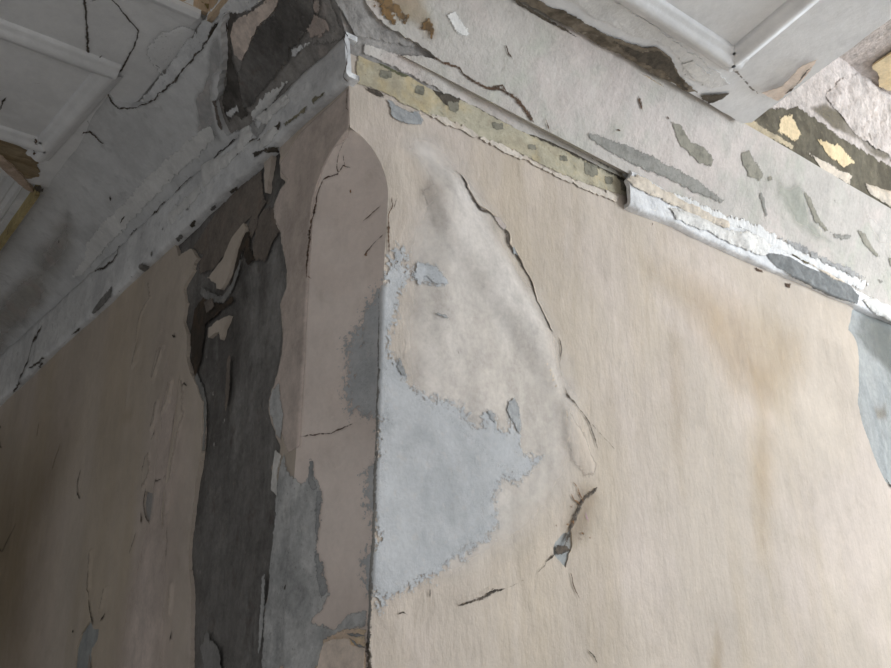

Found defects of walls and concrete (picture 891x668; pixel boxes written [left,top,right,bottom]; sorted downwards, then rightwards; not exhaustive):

crack [83,0,102,57]
crack [306,144,347,278]
rust [374,0,410,25]
rust [422,18,434,39]
peeling [291,0,620,176]
crack [456,171,562,365]
flaking render [514,0,729,104]
peeling [671,122,714,166]
flaking render [588,133,891,487]
flaking render [176,93,550,668]
crack [365,296,380,668]
crack [457,483,597,606]